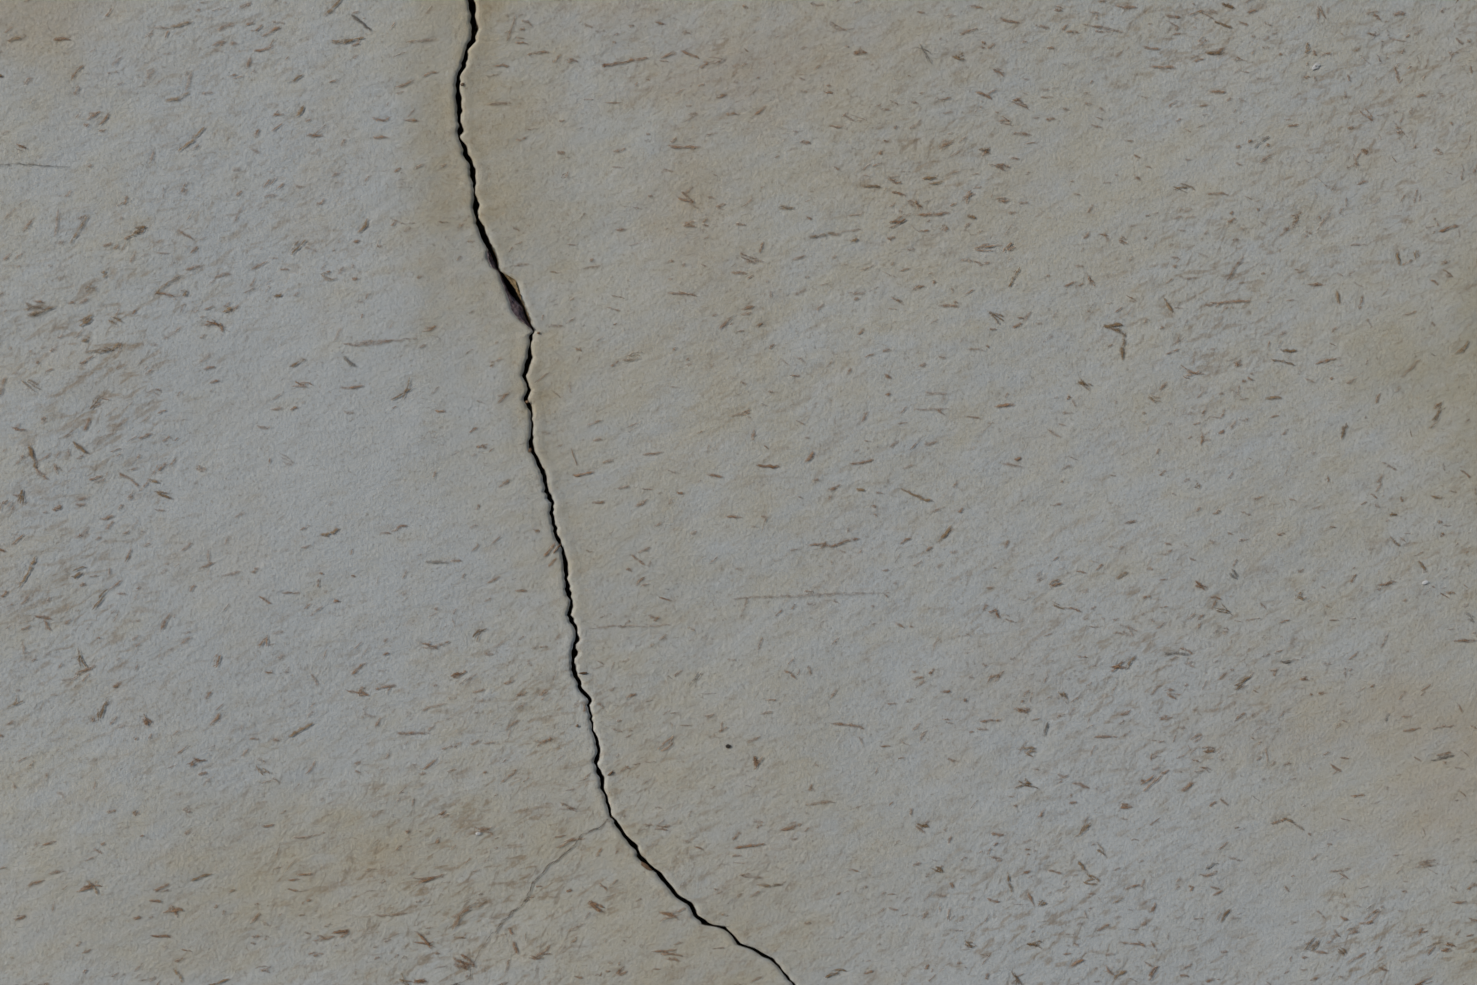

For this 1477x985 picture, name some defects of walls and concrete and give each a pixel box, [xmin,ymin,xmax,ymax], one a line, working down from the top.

crack [455,0,795,985]